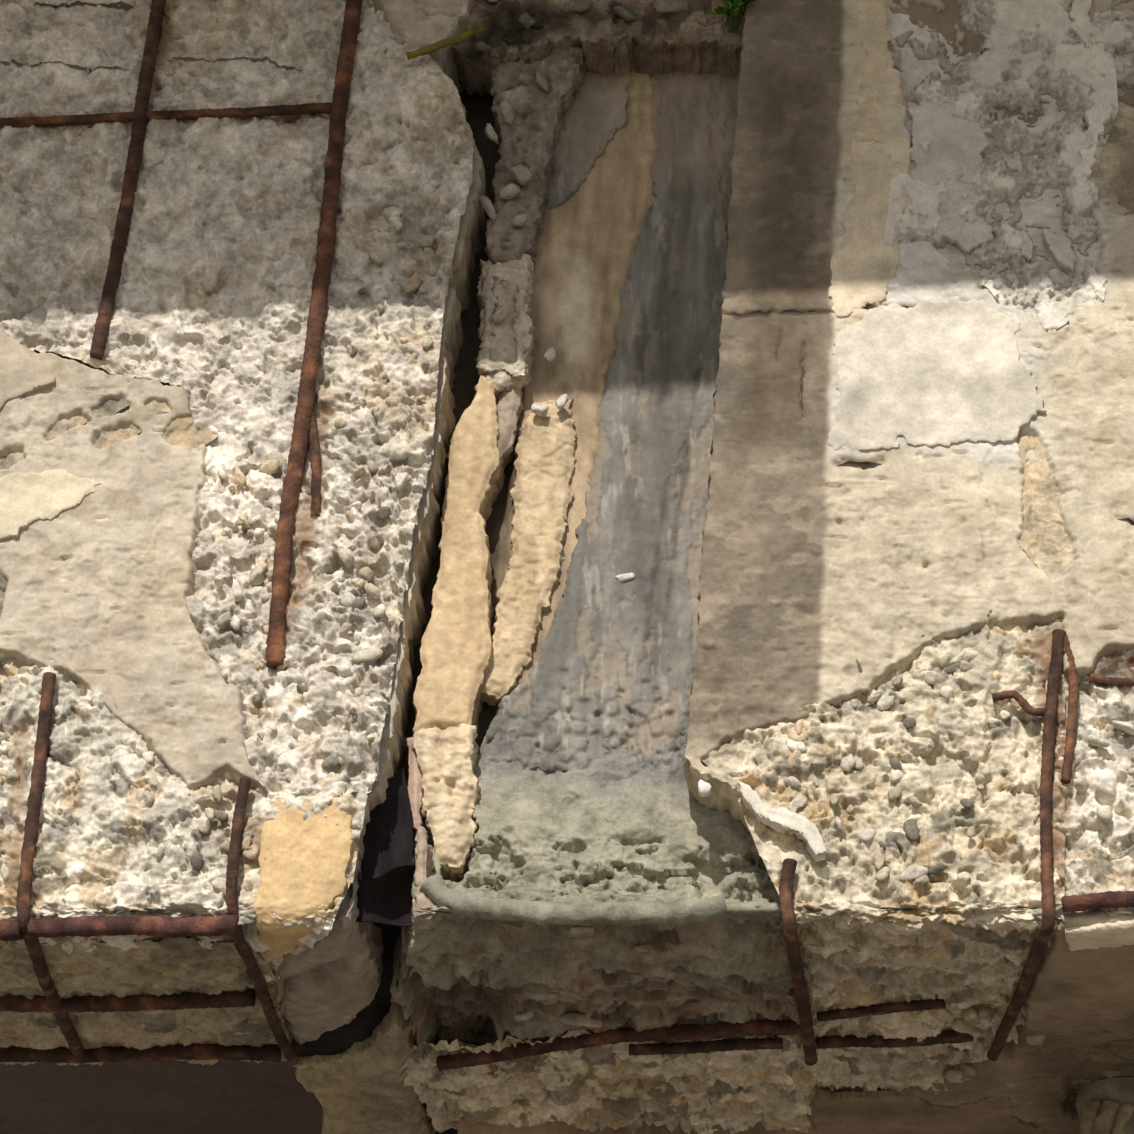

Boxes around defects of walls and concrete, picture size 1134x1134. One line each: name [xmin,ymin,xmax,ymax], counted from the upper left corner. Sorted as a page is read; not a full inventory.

crack [0,59,129,74]
crack [33,1,134,11]
crack [167,56,303,71]
leakage [629,70,657,199]
spalling [0,0,473,1066]
spalling [390,0,1134,1134]